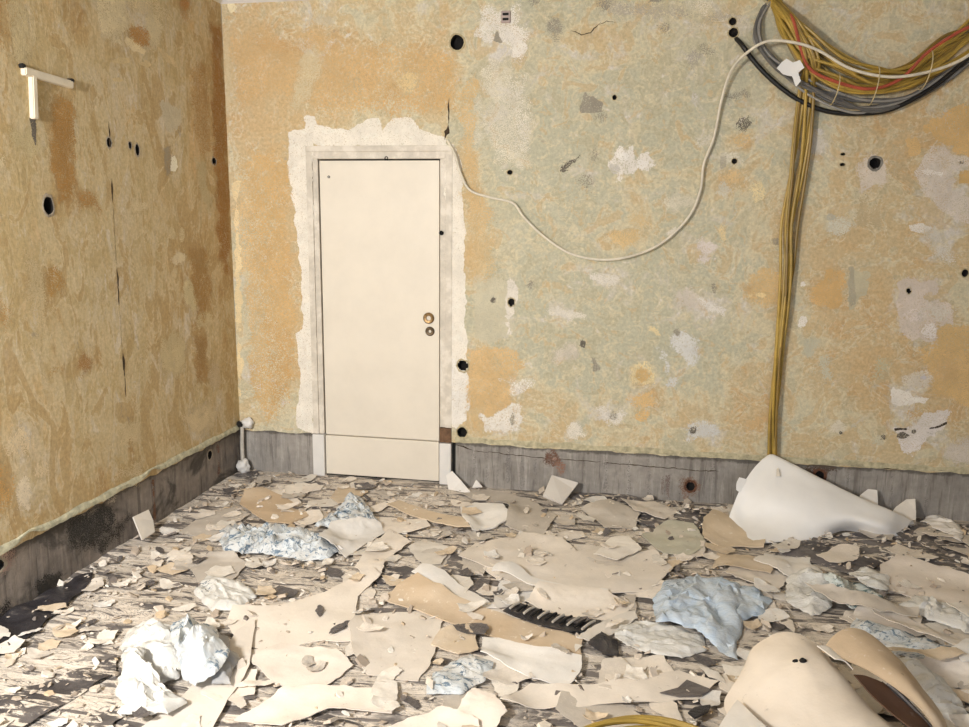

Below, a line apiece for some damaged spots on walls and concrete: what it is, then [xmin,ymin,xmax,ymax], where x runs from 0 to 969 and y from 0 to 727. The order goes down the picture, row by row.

spalling [449,31,528,58]
peeling [560,145,657,194]
flaking render [909,145,969,278]
peeling [895,276,957,342]
flaking render [452,358,766,460]
flaking render [778,357,969,480]
corrosion [543,449,566,476]
damp [65,503,133,555]
damp [34,563,63,595]